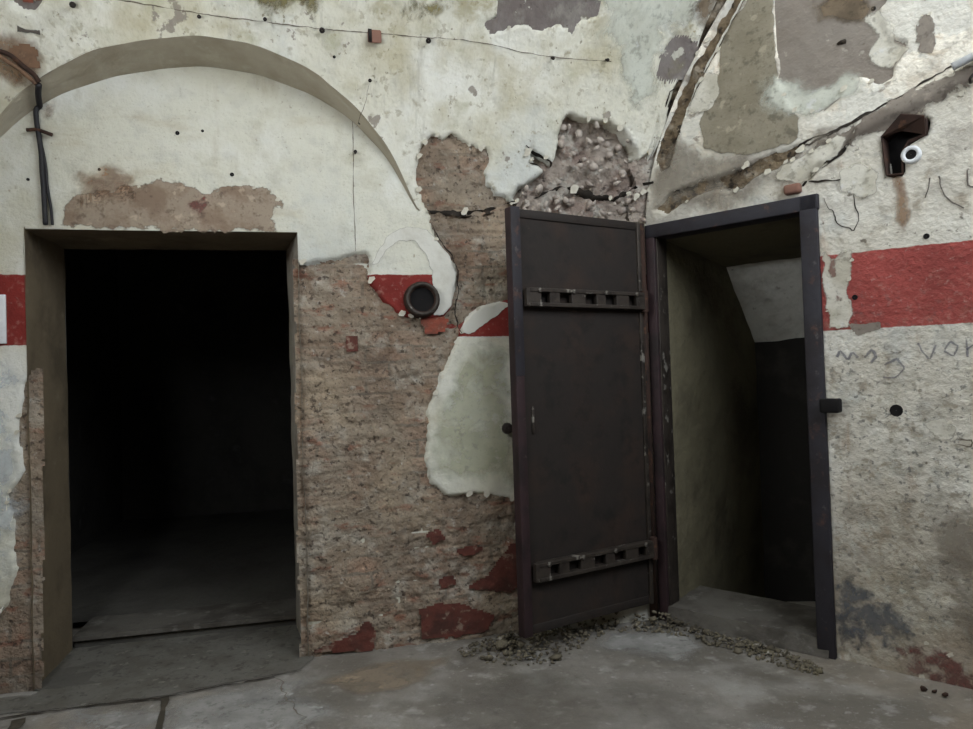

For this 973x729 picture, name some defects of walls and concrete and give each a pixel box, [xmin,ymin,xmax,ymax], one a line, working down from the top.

crack [665,85,676,116]
crack [795,65,952,231]
flaking render [63,173,283,233]
crack [673,185,698,204]
flaking render [293,0,973,657]
flaking render [0,368,45,694]
water stain [835,580,910,649]